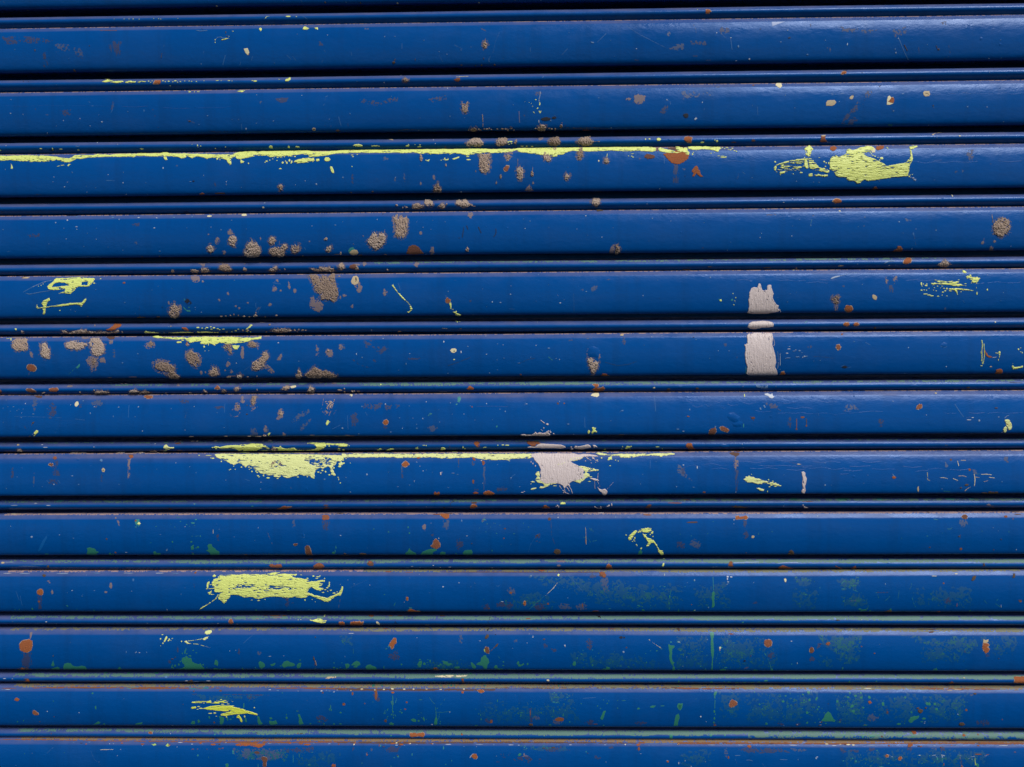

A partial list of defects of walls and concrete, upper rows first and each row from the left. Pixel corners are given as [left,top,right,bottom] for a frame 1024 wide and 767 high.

rust [644,136,703,177]
rust [19,639,32,653]